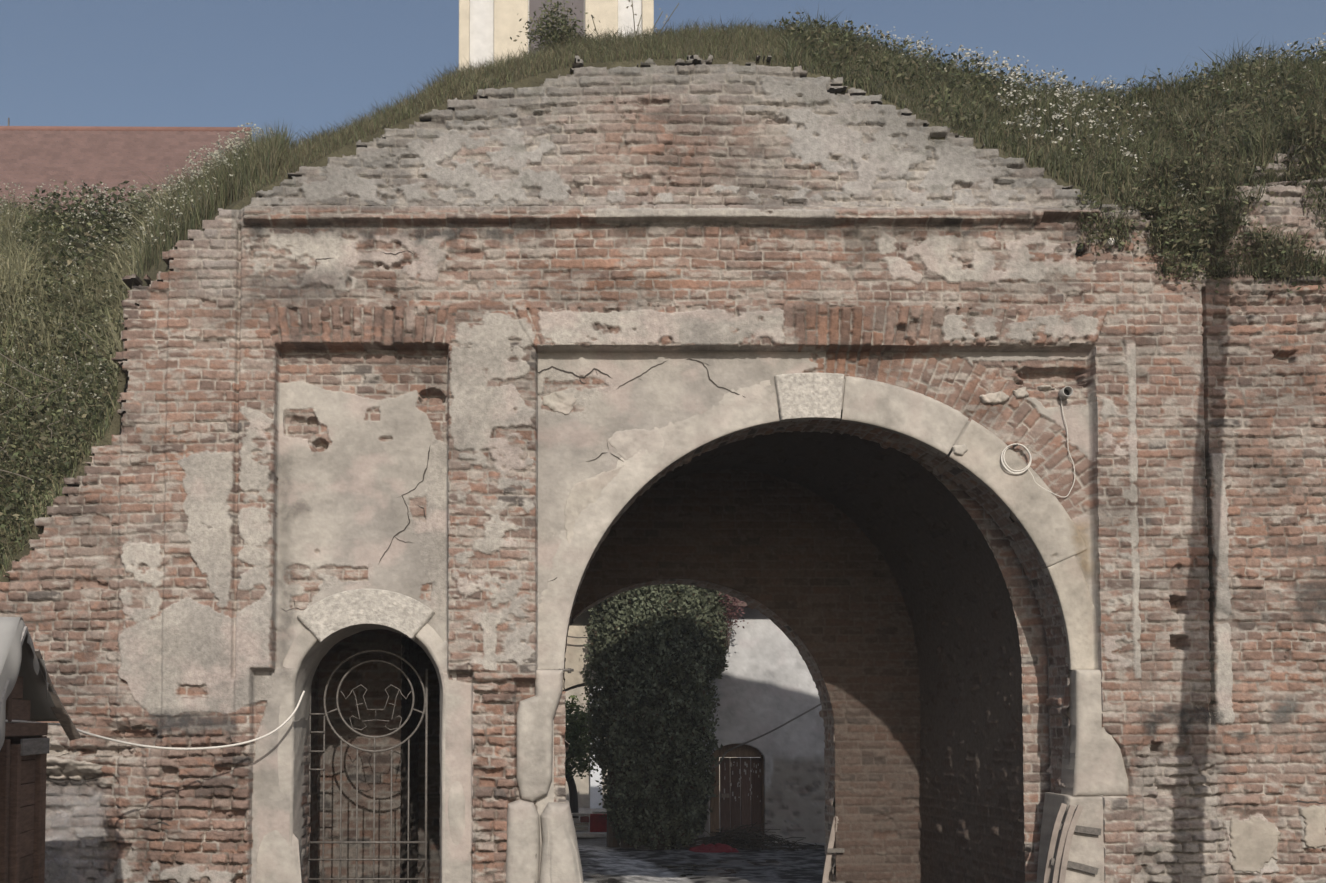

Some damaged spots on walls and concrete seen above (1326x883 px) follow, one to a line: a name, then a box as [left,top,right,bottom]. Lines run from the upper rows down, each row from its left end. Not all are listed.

crack [538,358,746,398]
crack [379,447,430,563]
flaking render [278,344,538,623]
spalling [174,684,207,701]
spalling [40,721,253,883]
spalling [1107,711,1326,883]